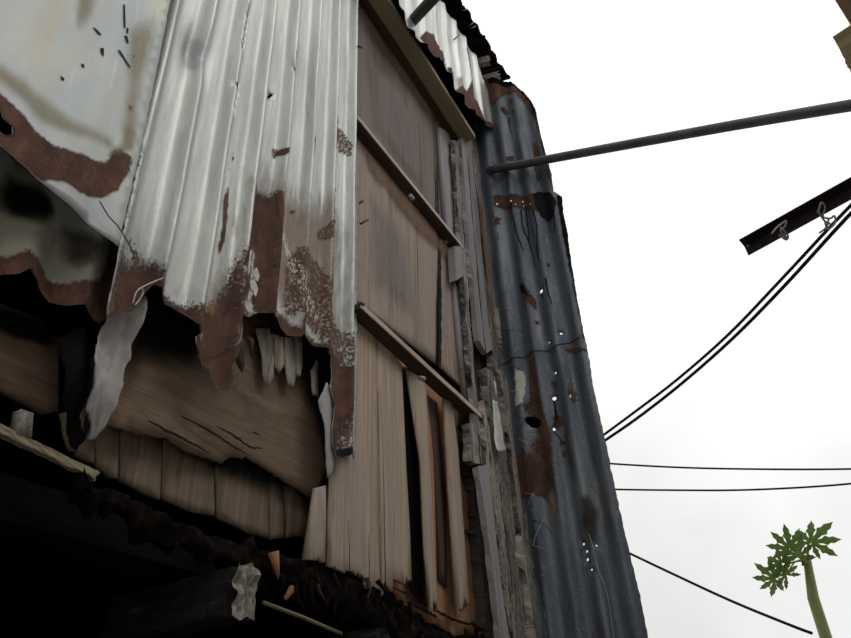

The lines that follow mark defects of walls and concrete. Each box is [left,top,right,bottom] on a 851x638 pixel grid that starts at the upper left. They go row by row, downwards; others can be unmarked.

rust [0,93,133,197]
rust [336,120,353,156]
rust [420,31,494,127]
rust [483,79,556,267]
rust [0,186,355,457]
rust [517,351,566,511]